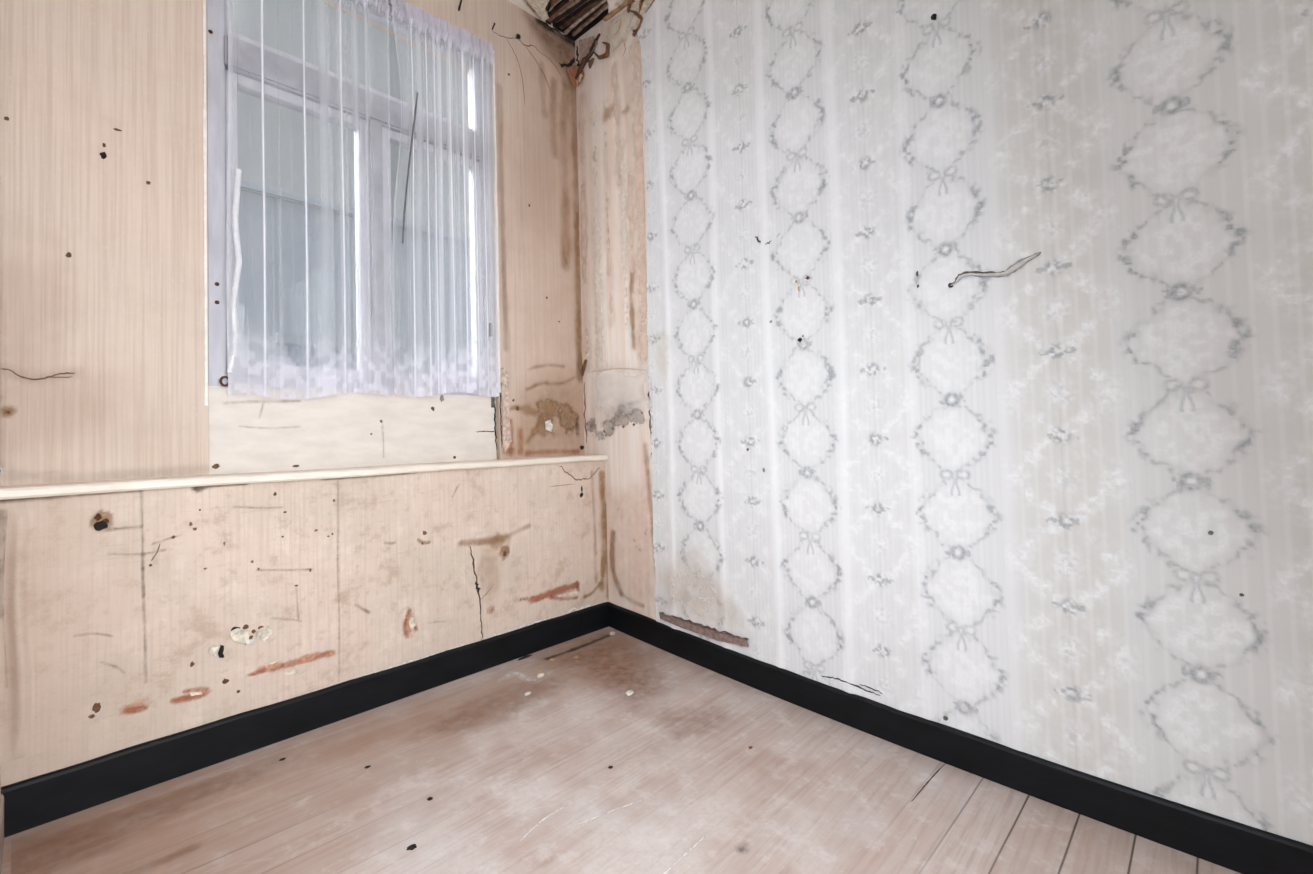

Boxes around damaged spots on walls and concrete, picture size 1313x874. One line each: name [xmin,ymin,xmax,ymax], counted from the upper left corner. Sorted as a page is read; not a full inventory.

spalling [542,0,585,88]
damp [524,0,582,167]
damp [563,116,648,379]
damp [512,399,643,450]
spalling [404,610,418,635]
crack [354,546,607,679]
spalling [520,582,579,601]
spalling [251,651,334,675]
spalling [172,689,205,703]